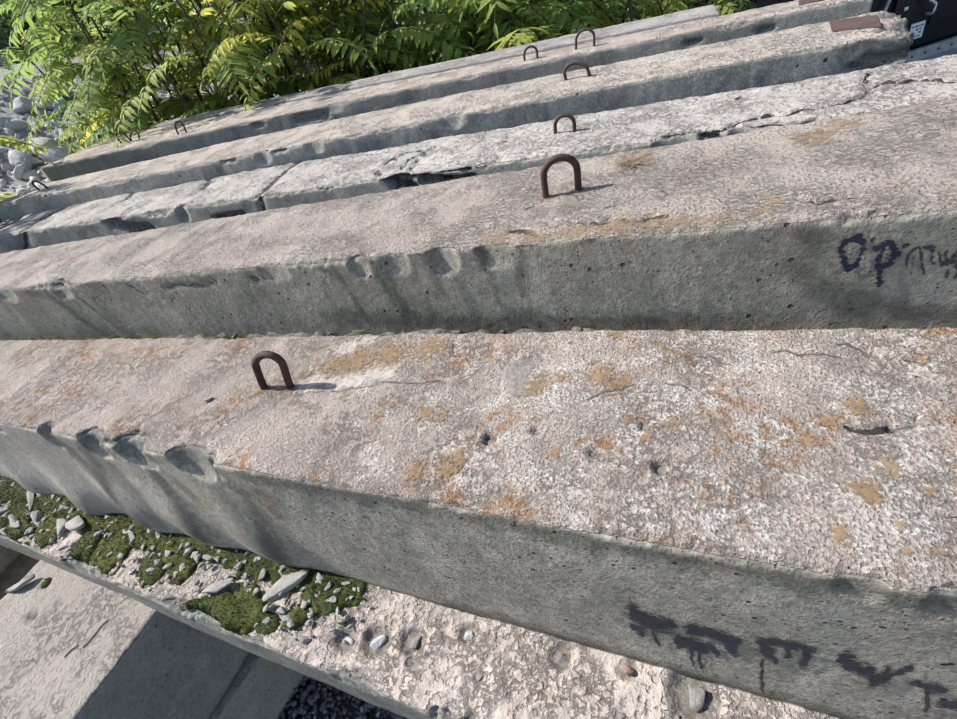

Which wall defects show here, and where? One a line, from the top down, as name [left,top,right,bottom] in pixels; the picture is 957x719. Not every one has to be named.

crack [721,72,955,132]
spalling [390,167,477,190]
spalling [80,429,153,461]